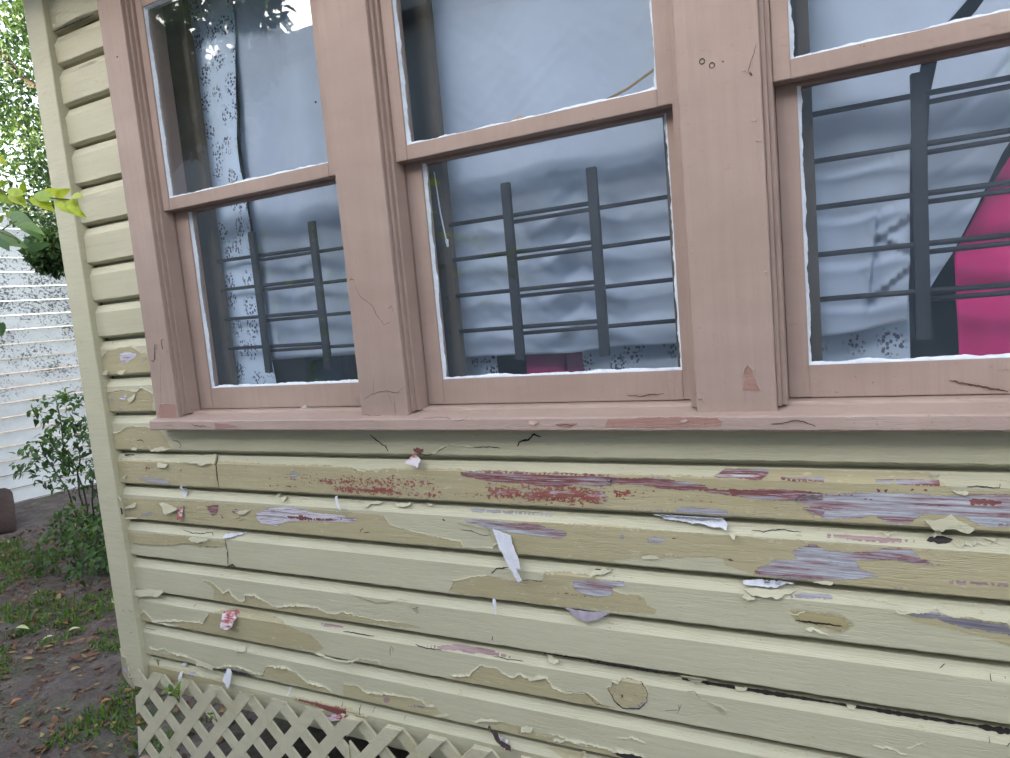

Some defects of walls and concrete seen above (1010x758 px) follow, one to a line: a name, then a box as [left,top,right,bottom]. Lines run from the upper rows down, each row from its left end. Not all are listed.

peeling [101,343,150,375]
peeling [106,386,176,418]
peeling [605,417,725,428]
peeling [112,424,1010,646]
peeling [123,578,422,666]
peeling [119,648,135,690]
peeling [147,645,369,722]
peeling [415,644,610,708]
spalling [544,653,980,727]
peeling [472,718,647,758]